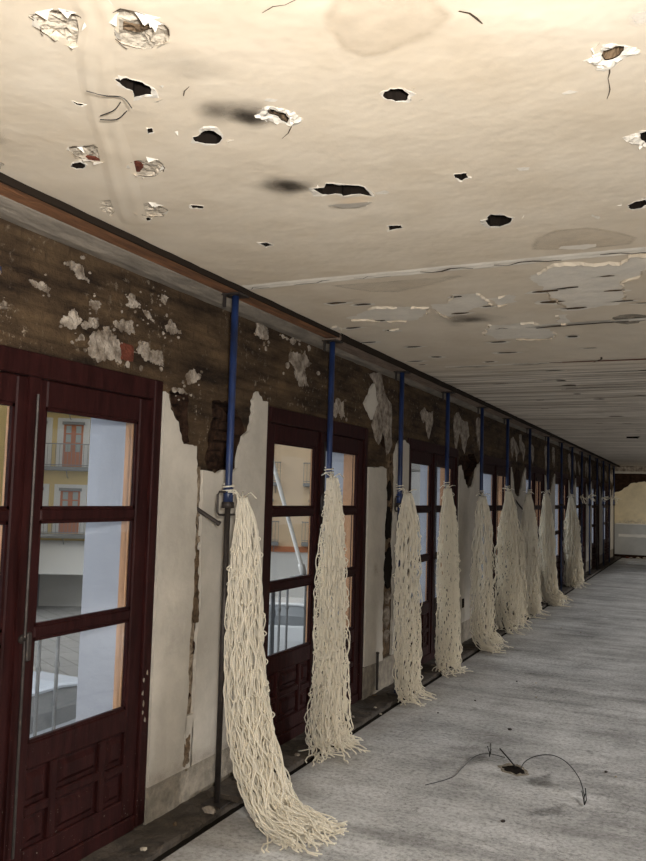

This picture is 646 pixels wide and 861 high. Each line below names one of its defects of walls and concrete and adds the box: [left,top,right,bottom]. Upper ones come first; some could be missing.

spalling [29,8,86,49]
spalling [109,8,170,49]
spalling [591,46,624,66]
spalling [67,144,103,165]
spalling [126,157,167,178]
peeling [324,253,646,366]
flaking render [120,342,143,371]
spalling [169,380,200,443]
spalling [204,400,244,472]